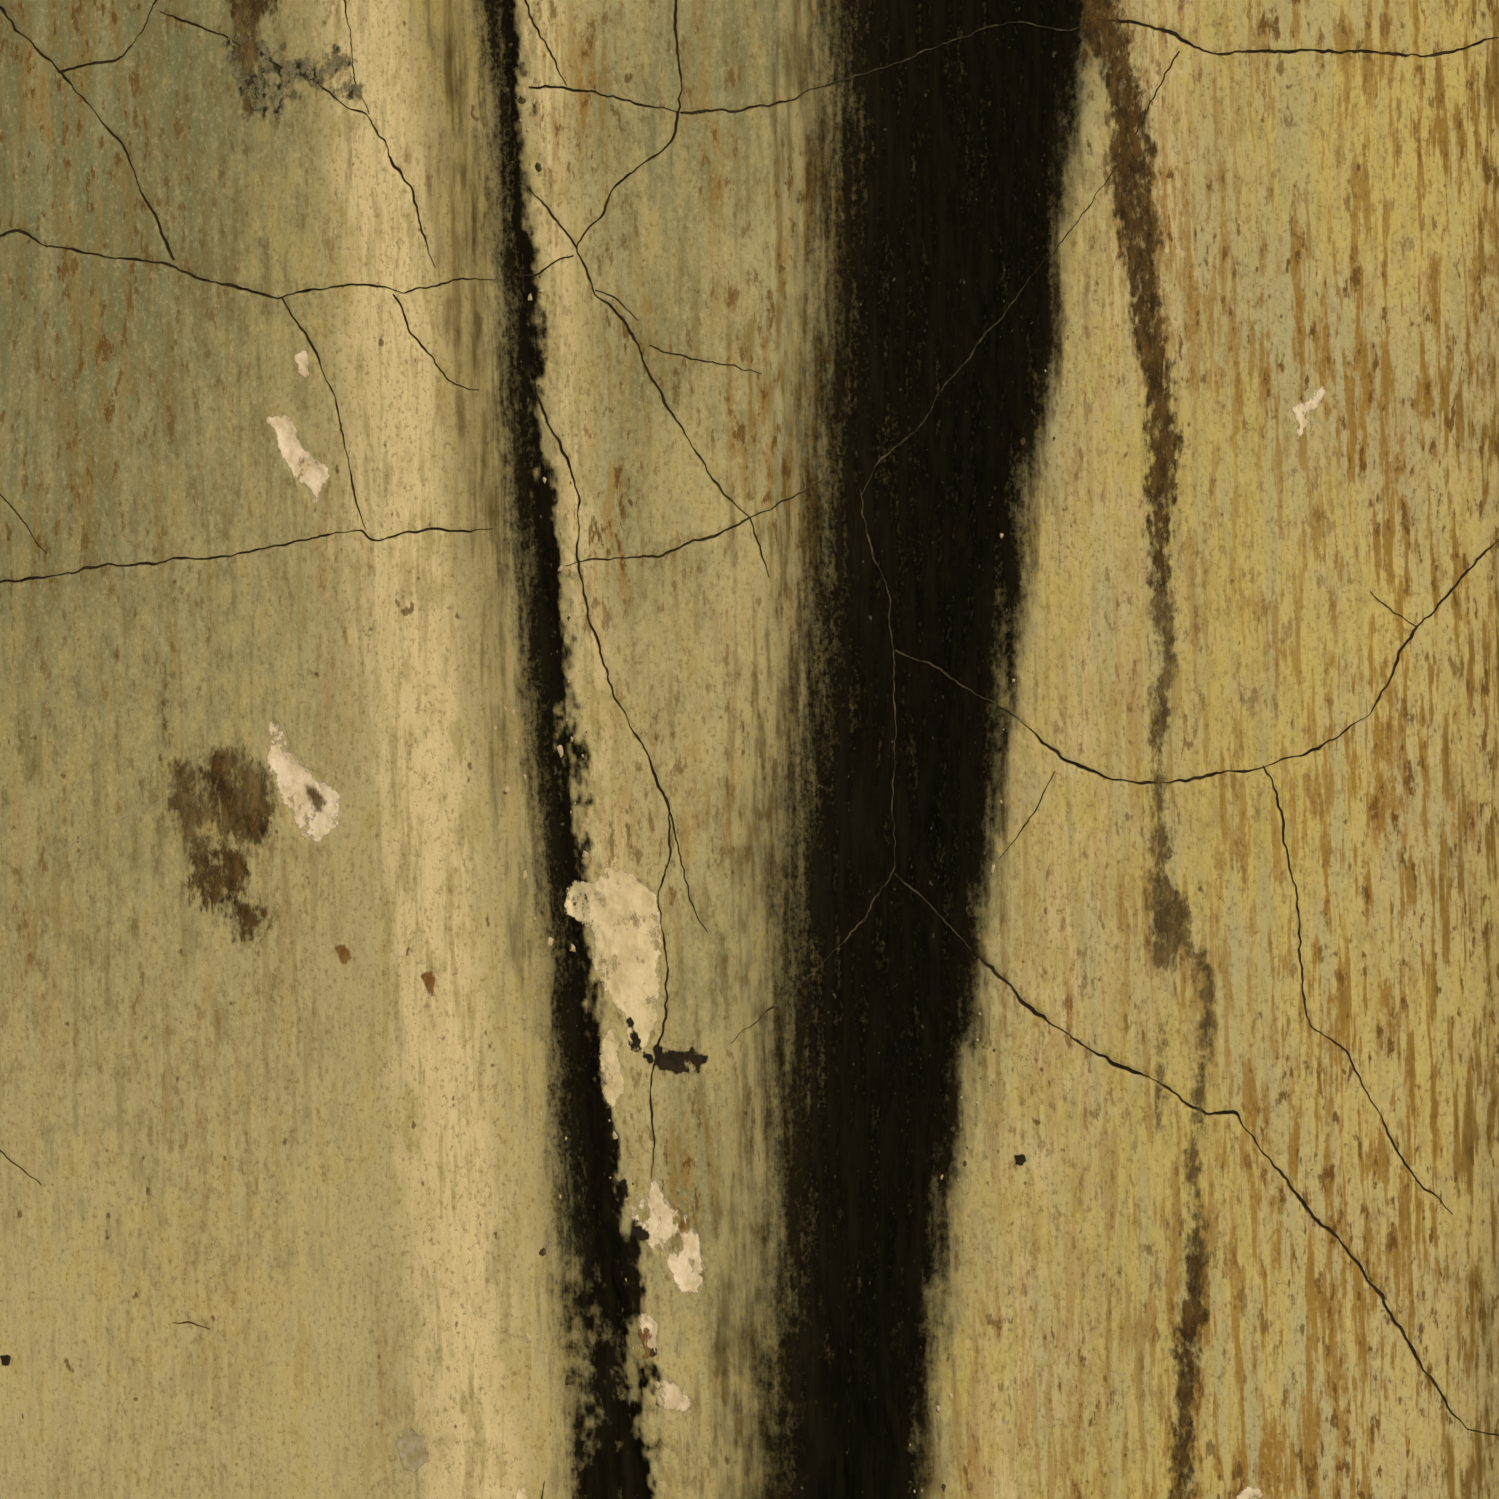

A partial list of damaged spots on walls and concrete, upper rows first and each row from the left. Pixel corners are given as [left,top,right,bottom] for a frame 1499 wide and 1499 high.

damp [223,0,362,120]
spalling [294,350,309,378]
spalling [266,415,330,503]
crack [0,0,1499,1178]
damp [168,748,276,942]
spalling [267,721,341,842]
crack [731,166,1499,1436]
peeling [548,867,708,1139]
peeling [609,1177,704,1293]
peeling [621,1307,658,1357]